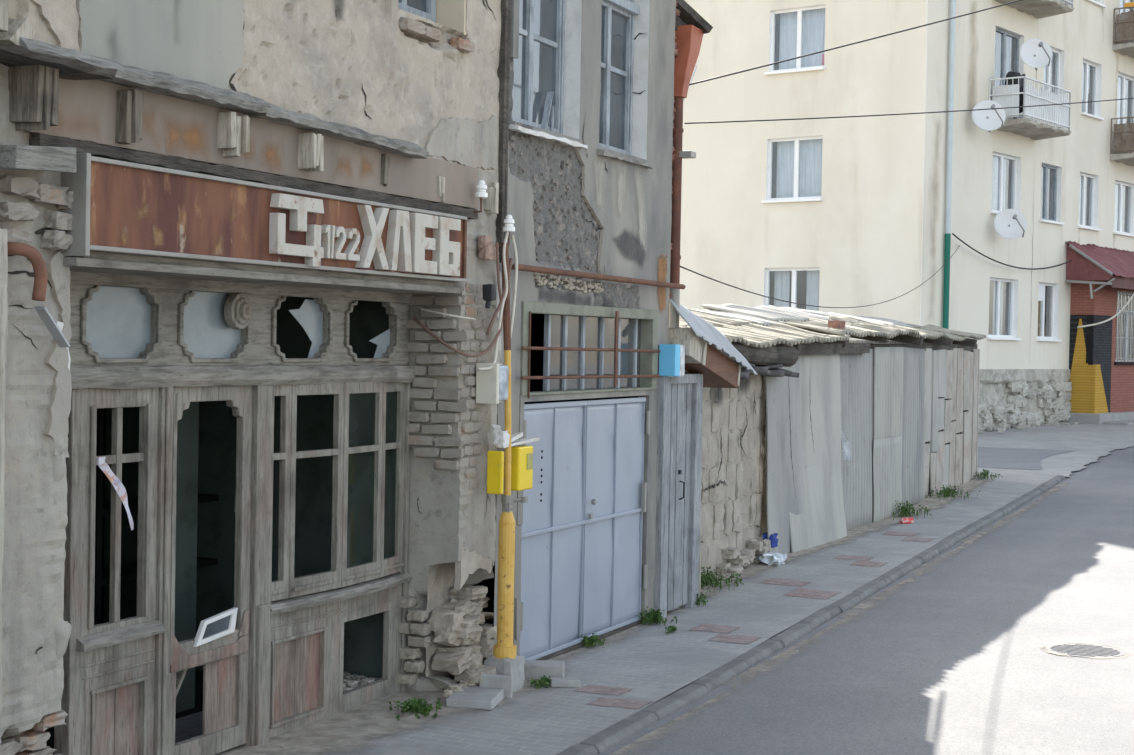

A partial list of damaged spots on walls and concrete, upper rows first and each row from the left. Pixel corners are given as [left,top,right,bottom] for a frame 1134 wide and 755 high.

spalling [399,17,475,53]
peeling [425,115,610,293]
rust [658,257,666,311]
spalling [407,283,496,490]
spalling [397,549,497,697]
spalling [0,710,68,755]